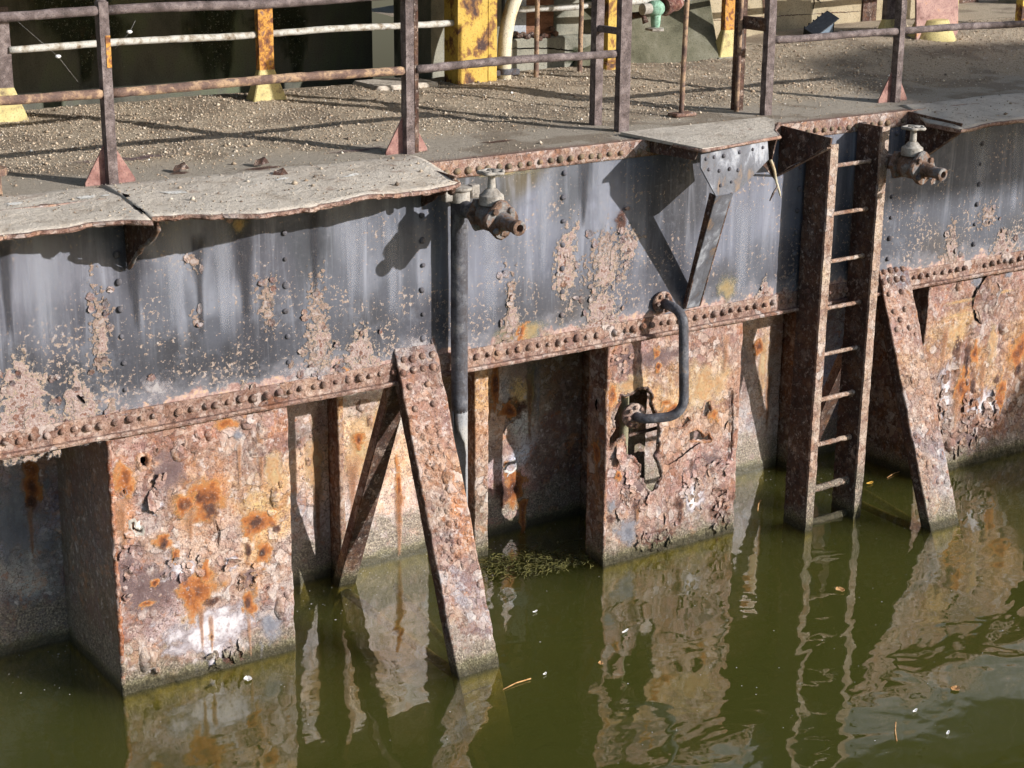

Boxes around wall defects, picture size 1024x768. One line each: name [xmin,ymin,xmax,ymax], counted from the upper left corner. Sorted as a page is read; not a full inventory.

peeling [2,449,61,466]
peeling [0,262,116,433]
corrosion [154,452,228,544]
corrosion [234,497,282,576]
peeling [285,260,383,381]
corrosion [393,444,405,551]
corrosion [415,422,482,595]
peeling [496,262,523,344]
peeling [552,206,647,329]
spalling [616,441,658,522]
corrosion [903,299,1024,503]
corrosion [126,534,281,665]